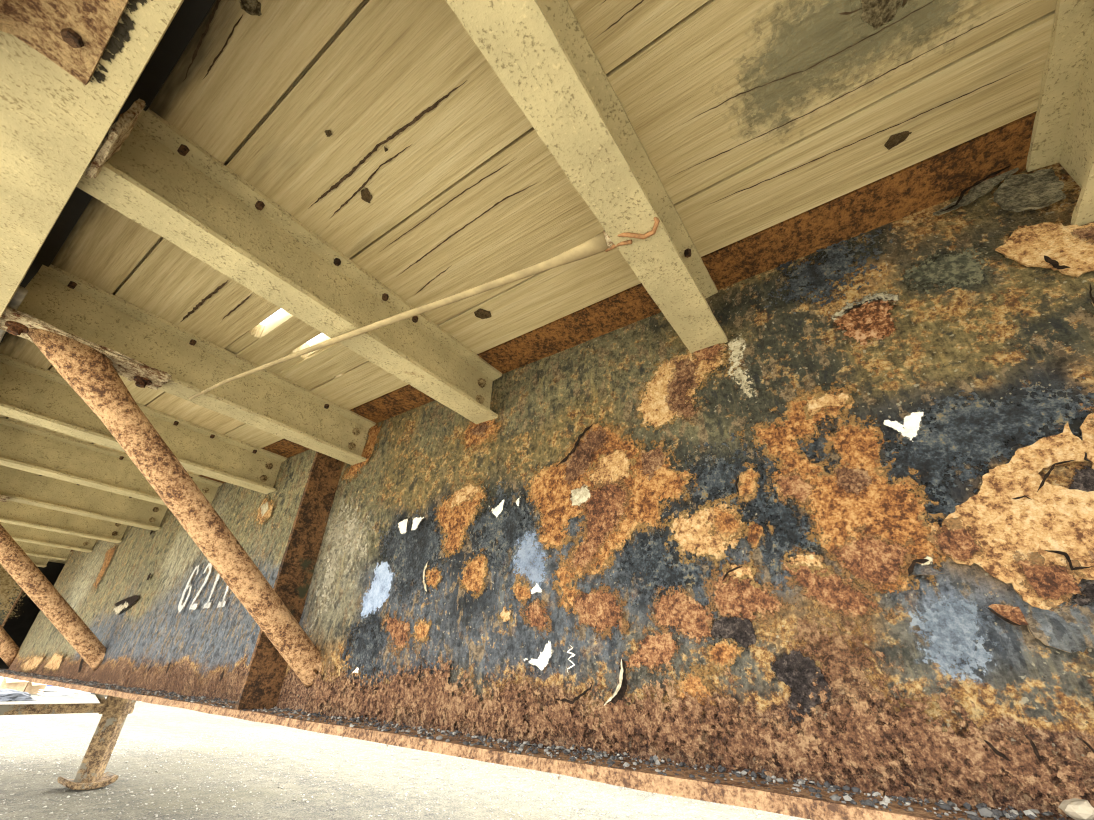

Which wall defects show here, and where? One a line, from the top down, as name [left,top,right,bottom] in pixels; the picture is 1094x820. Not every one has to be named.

peeling [933,166,1066,216]
rust [831,291,899,346]
rust [253,495,275,527]
peeling [398,517,424,534]
peeling [489,498,520,517]
rust [0,564,29,622]
rust [91,544,118,592]
rust [301,335,1094,820]
peeling [524,641,552,670]
peeling [604,659,623,705]